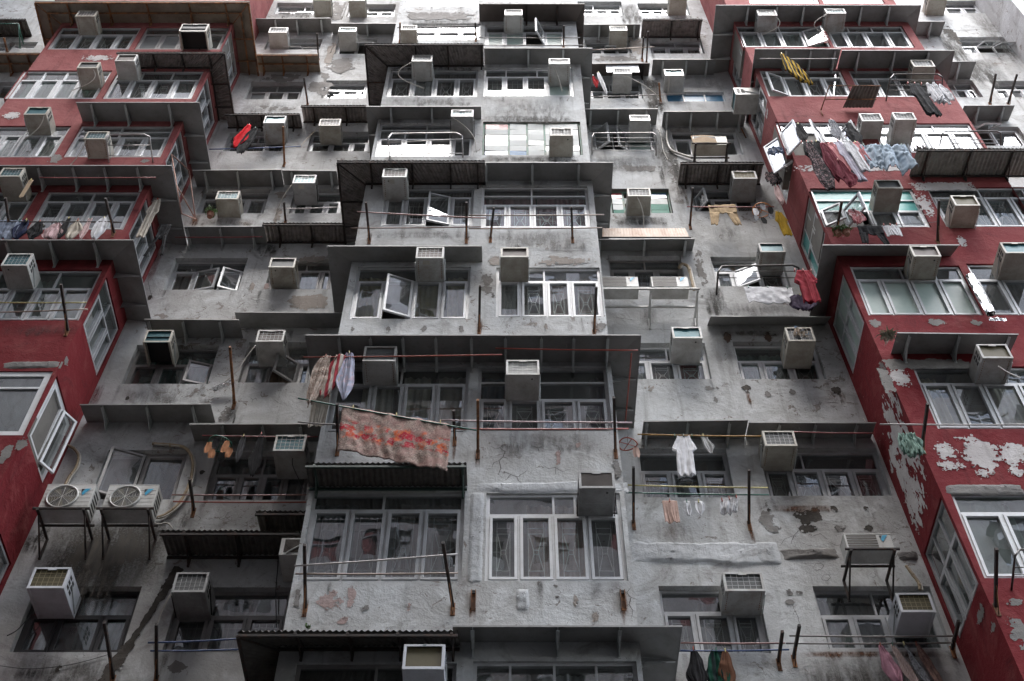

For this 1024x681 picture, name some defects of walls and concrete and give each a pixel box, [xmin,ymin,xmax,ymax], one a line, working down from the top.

peeling [908,182,977,217]
peeling [0,437,28,464]
crack [491,444,570,482]
peeling [876,358,970,534]
peeling [933,434,1024,478]
peeling [316,585,369,624]
peeling [977,598,1024,650]